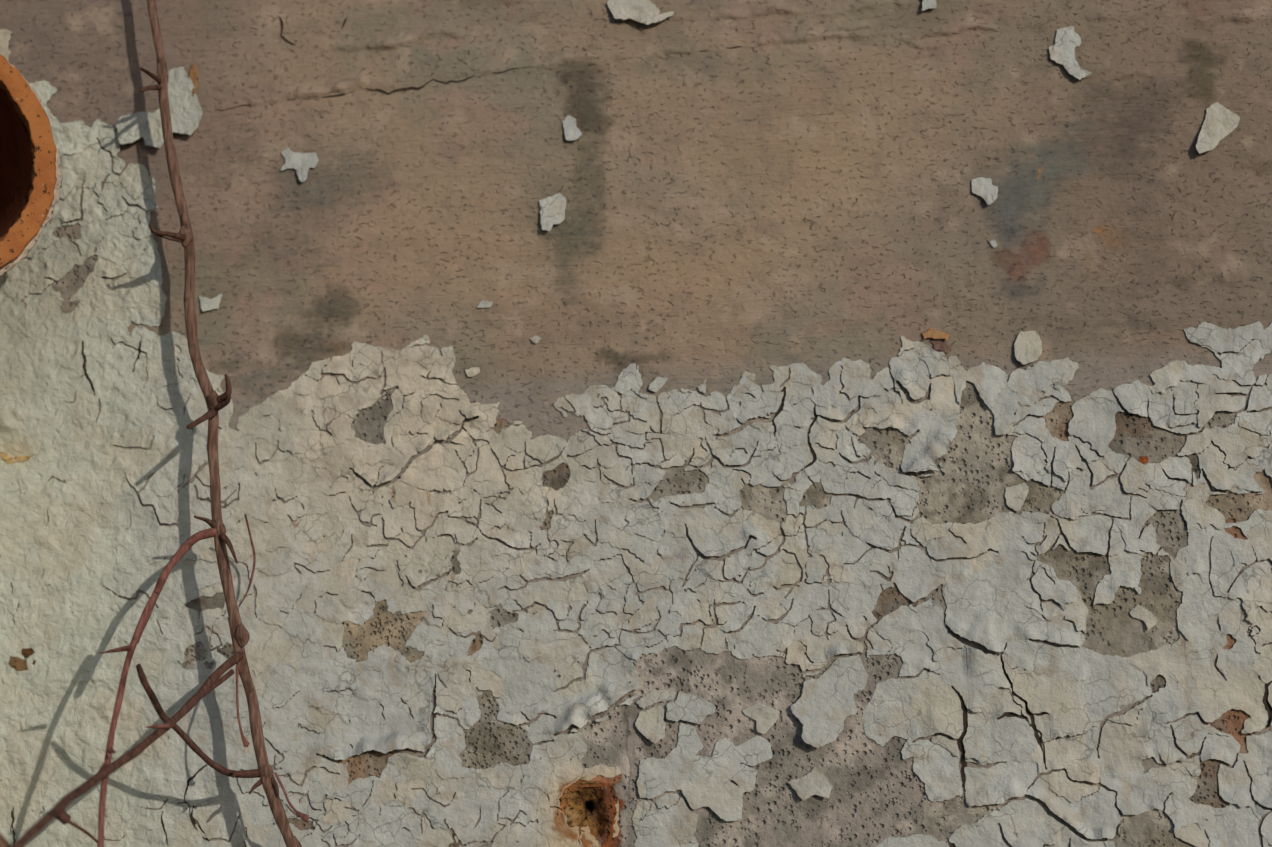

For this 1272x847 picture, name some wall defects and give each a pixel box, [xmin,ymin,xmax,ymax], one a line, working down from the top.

peeling [607,0,674,25]
peeling [1049,26,1092,80]
peeling [1196,102,1240,154]
peeling [539,193,566,231]
peeling [0,67,286,847]
crack [772,387,818,471]
peeling [218,321,1272,847]
crack [951,686,968,788]
crack [997,654,1048,769]
crack [1262,681,1272,727]
crack [161,764,209,841]
rust [553,774,624,847]